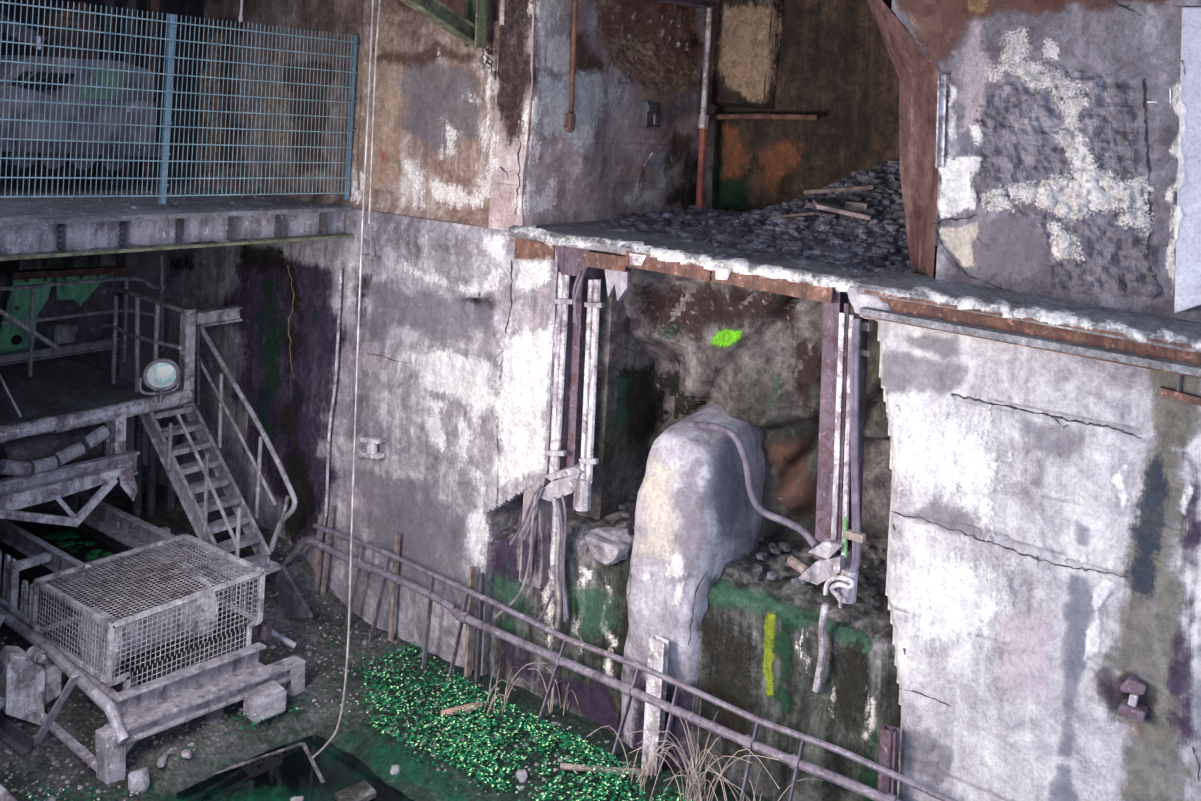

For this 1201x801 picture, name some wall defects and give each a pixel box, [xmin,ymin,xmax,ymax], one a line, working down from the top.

rust [596,0,704,91]
rust [895,0,1128,74]
water stain [512,0,622,248]
rust [722,123,804,192]
crack [1142,78,1163,300]
water stain [604,239,858,292]
peeling [881,336,965,394]
water stain [224,236,554,647]
crack [951,393,1142,439]
crack [891,511,1127,578]
water stain [1084,370,1201,801]
water stain [503,566,646,753]